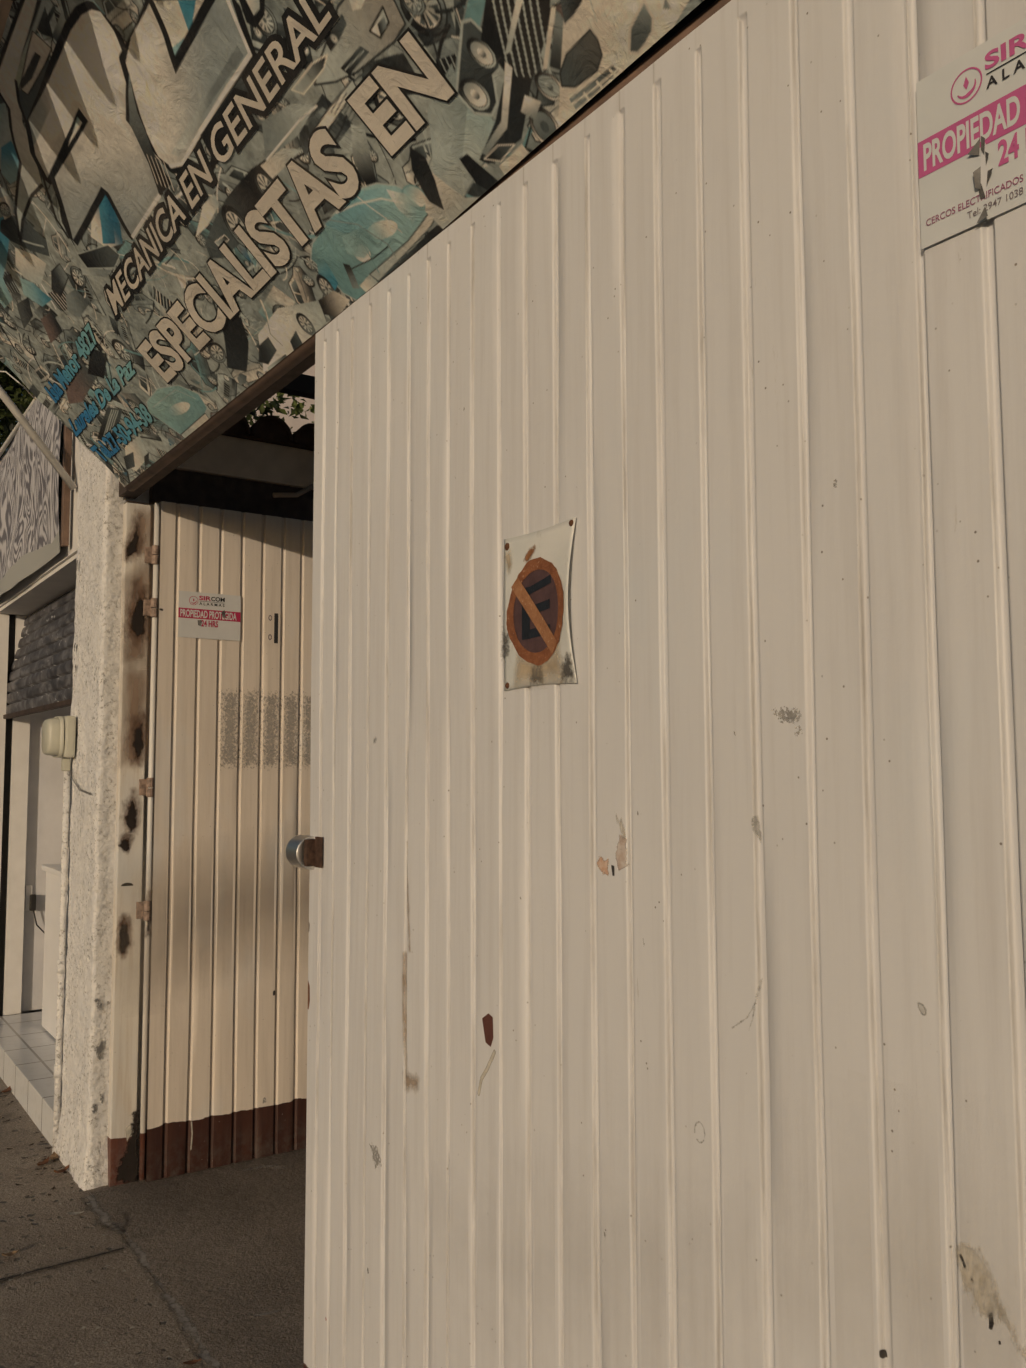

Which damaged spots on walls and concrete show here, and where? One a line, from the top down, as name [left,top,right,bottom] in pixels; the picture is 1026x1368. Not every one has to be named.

peeling [597,821,627,876]